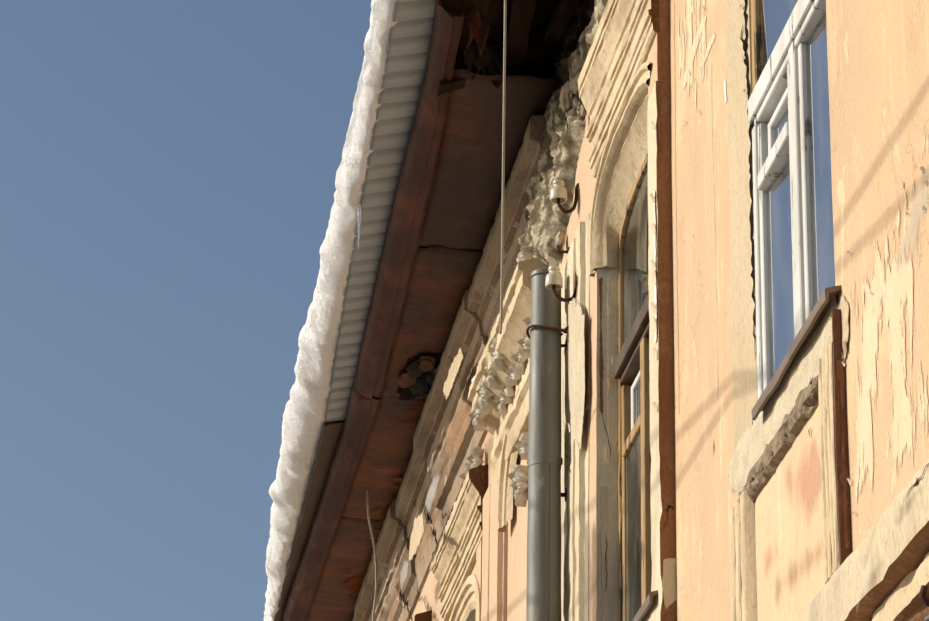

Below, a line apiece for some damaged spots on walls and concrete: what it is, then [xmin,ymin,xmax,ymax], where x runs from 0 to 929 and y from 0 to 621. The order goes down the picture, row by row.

spalling [518,0,608,268]
peeling [677,0,715,115]
crack [739,0,756,357]
peeling [728,122,929,517]